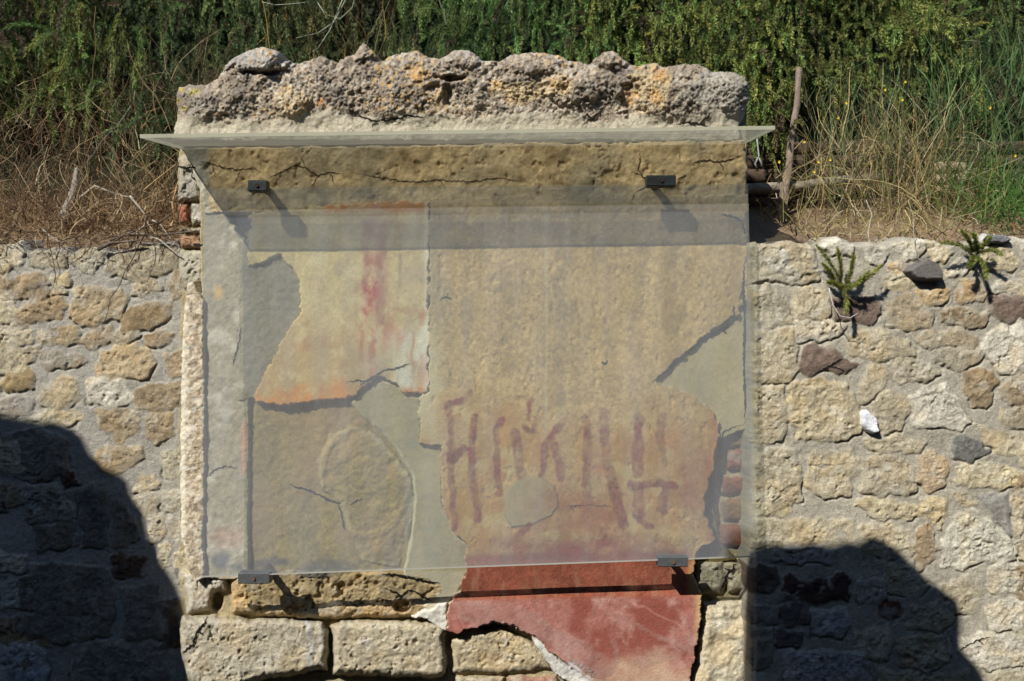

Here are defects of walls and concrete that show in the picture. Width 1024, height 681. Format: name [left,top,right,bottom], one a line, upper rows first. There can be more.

crack [178,157,528,190]
crack [631,153,645,200]
crack [677,158,735,180]
crack [346,363,412,386]
flaking render [657,305,747,440]
flaking render [238,238,411,580]
crack [652,262,747,551]
crack [289,484,362,529]
flaking render [411,602,448,631]
flaking render [530,634,589,681]